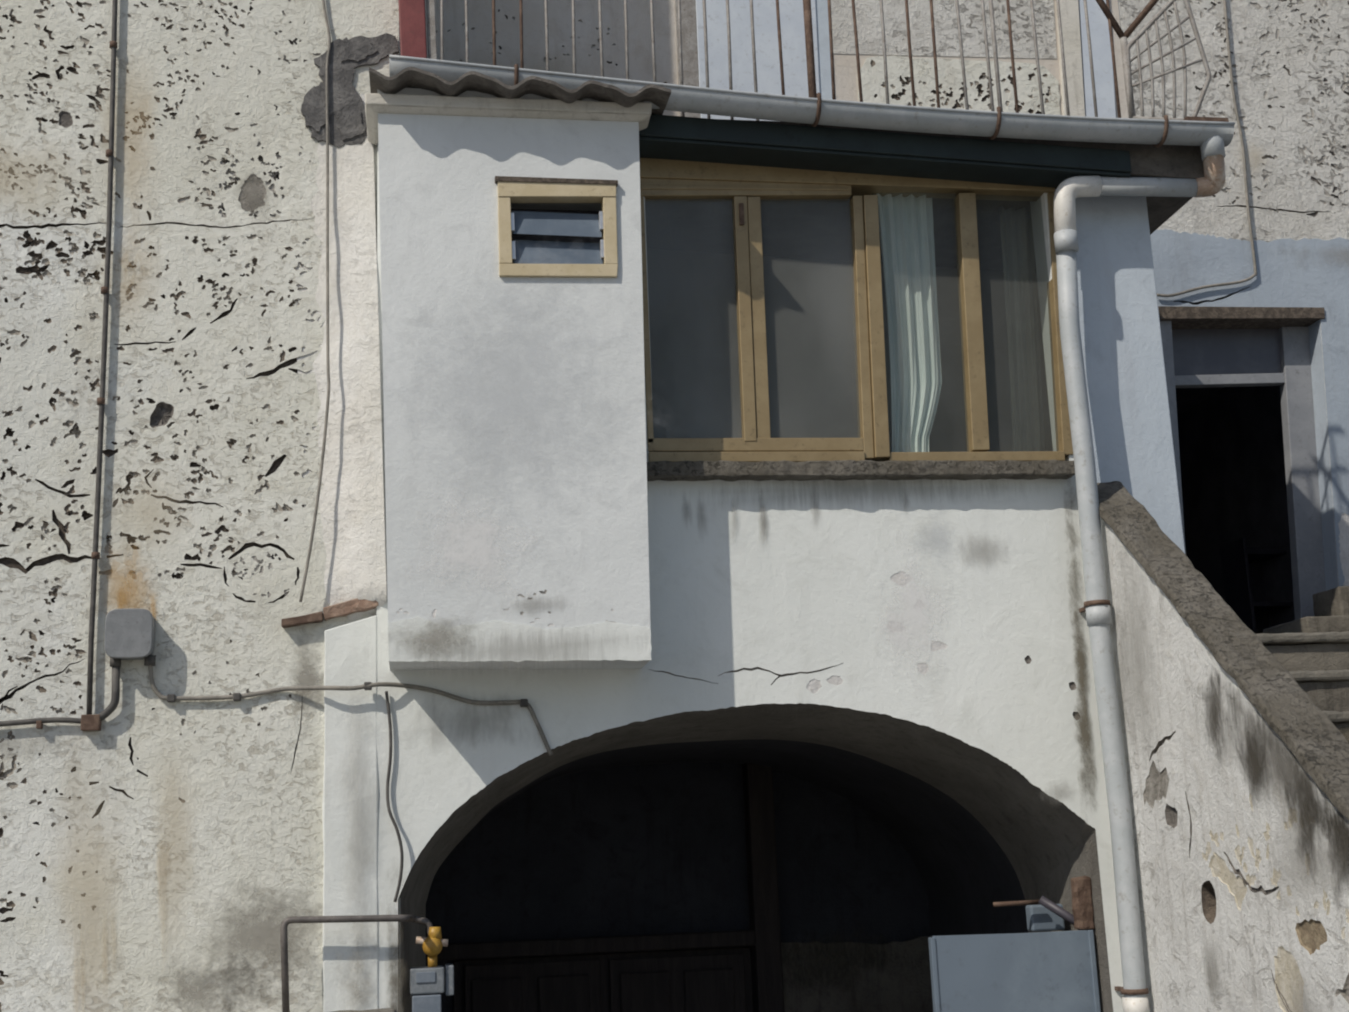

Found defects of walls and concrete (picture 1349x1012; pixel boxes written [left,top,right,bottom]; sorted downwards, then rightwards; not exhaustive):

crack [0,218,312,229]
crack [114,298,238,345]
crack [246,351,319,379]
crack [265,454,286,477]
crack [0,479,124,574]
crack [181,542,300,603]
peeling [1338,512,1349,586]
crack [0,659,84,704]
crack [649,663,843,685]
peeling [1143,761,1178,829]
water stain [1209,678,1349,885]
crack [1224,852,1279,895]